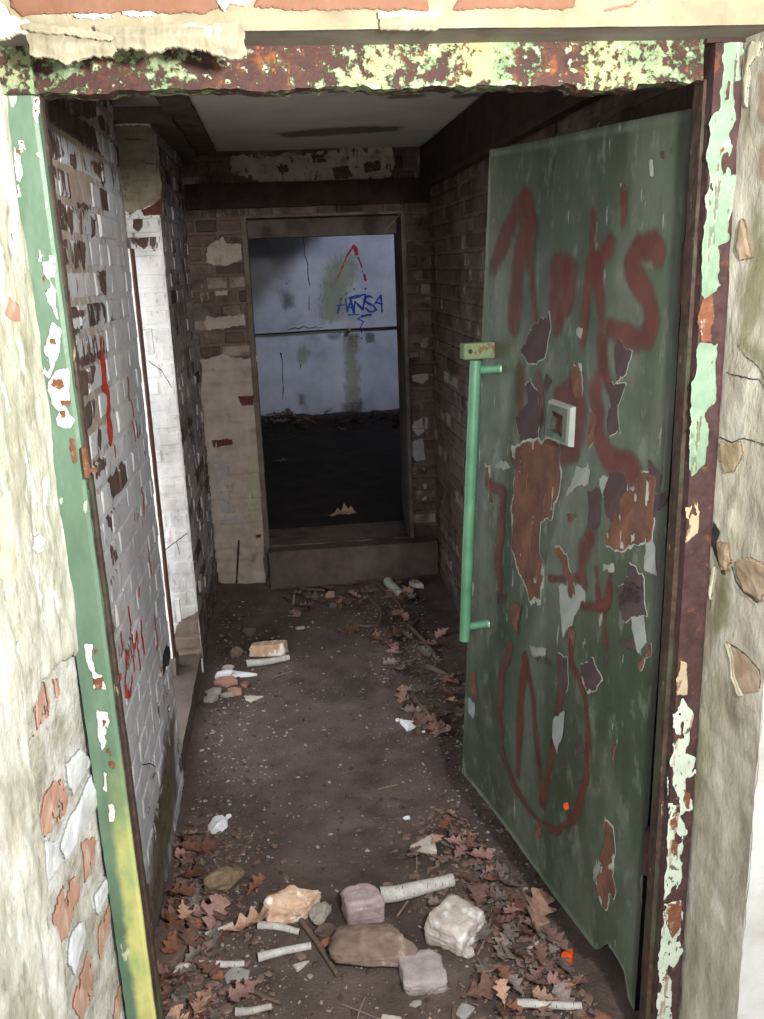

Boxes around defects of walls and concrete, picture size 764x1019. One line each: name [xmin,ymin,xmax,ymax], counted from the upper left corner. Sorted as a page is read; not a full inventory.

flaking render [0,0,439,67]
flaking render [33,97,162,249]
peeling [38,255,101,428]
corrosion [698,294,714,342]
crack [726,344,764,387]
peeling [93,427,128,498]
peeling [587,459,669,623]
flaking render [708,522,764,603]
peeling [84,644,106,690]
flaking render [32,678,60,737]
peeling [96,710,109,750]
flaking render [39,749,115,1019]